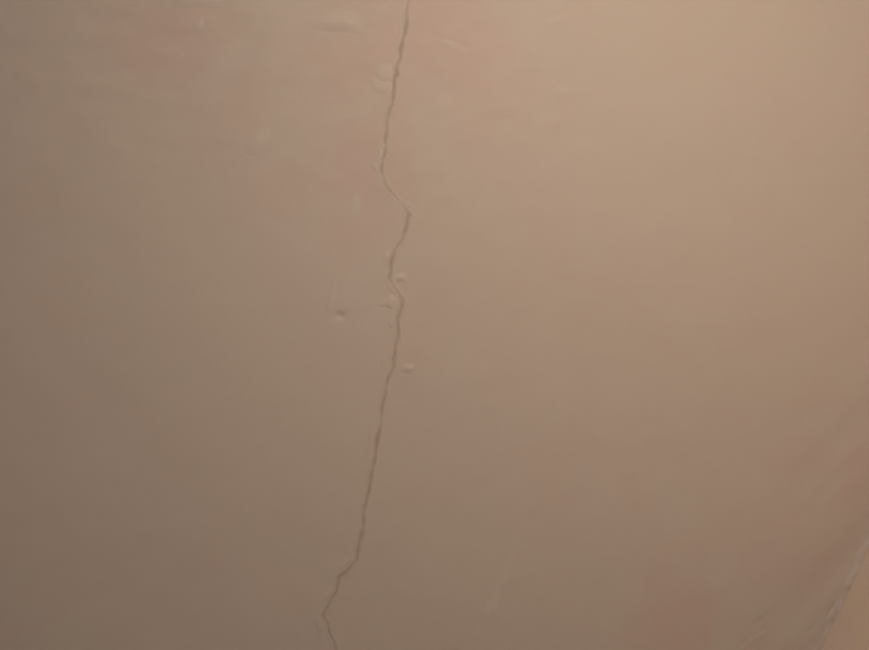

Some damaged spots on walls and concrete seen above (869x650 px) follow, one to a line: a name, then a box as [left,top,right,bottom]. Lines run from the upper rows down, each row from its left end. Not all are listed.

crack [314,0,417,650]